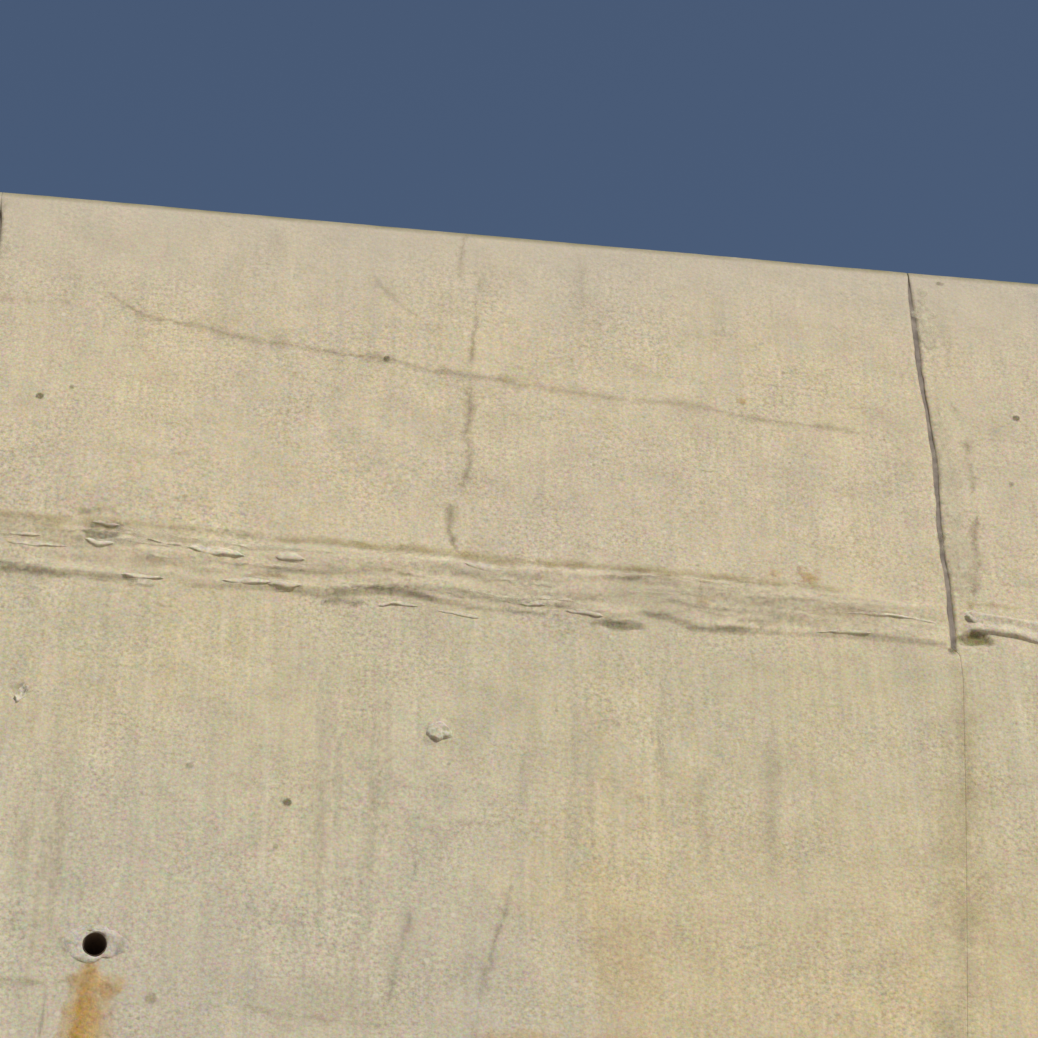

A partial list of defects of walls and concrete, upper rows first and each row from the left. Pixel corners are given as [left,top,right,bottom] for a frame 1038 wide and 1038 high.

peeling [7,531,68,547]
spalling [84,519,121,547]
peeling [146,539,246,564]
peeling [221,552,305,590]